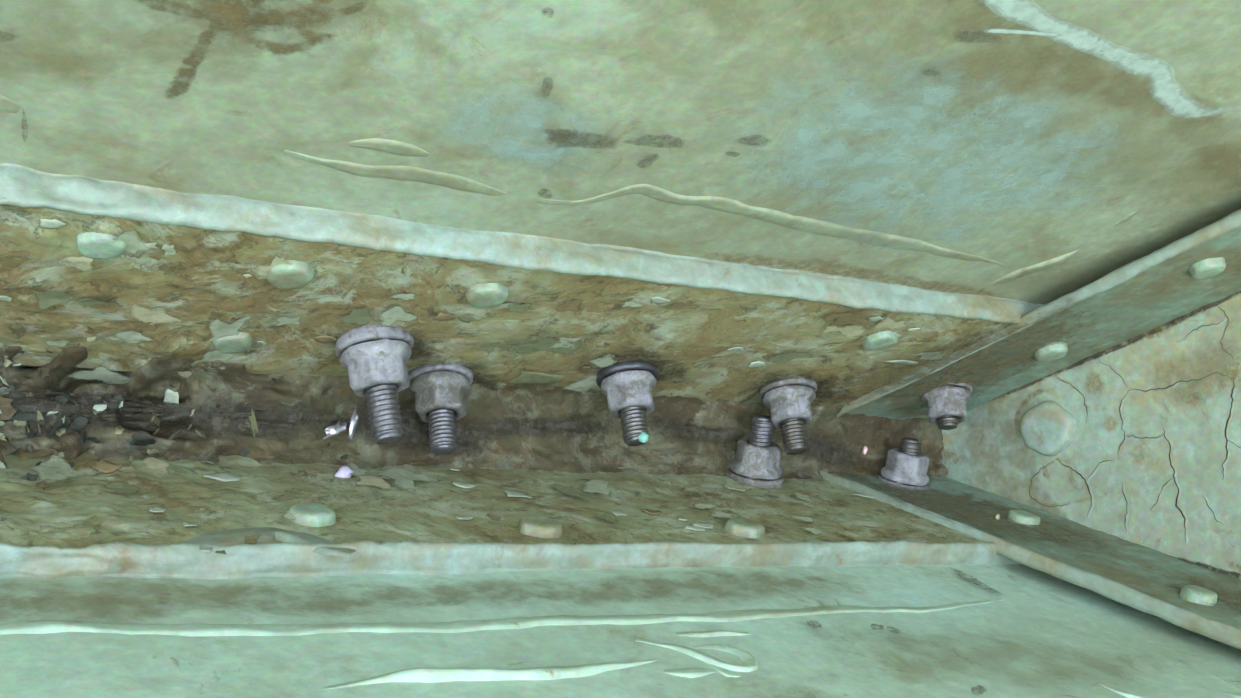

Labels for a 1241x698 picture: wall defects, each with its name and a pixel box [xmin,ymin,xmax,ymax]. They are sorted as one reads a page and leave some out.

rust [150,0,361,97]
peeling [59,256,93,271]
peeling [243,256,290,278]
peeling [31,290,182,344]
peeling [178,316,251,378]
peeling [276,316,301,326]
peeling [69,366,131,384]
crack [1029,305,1241,543]